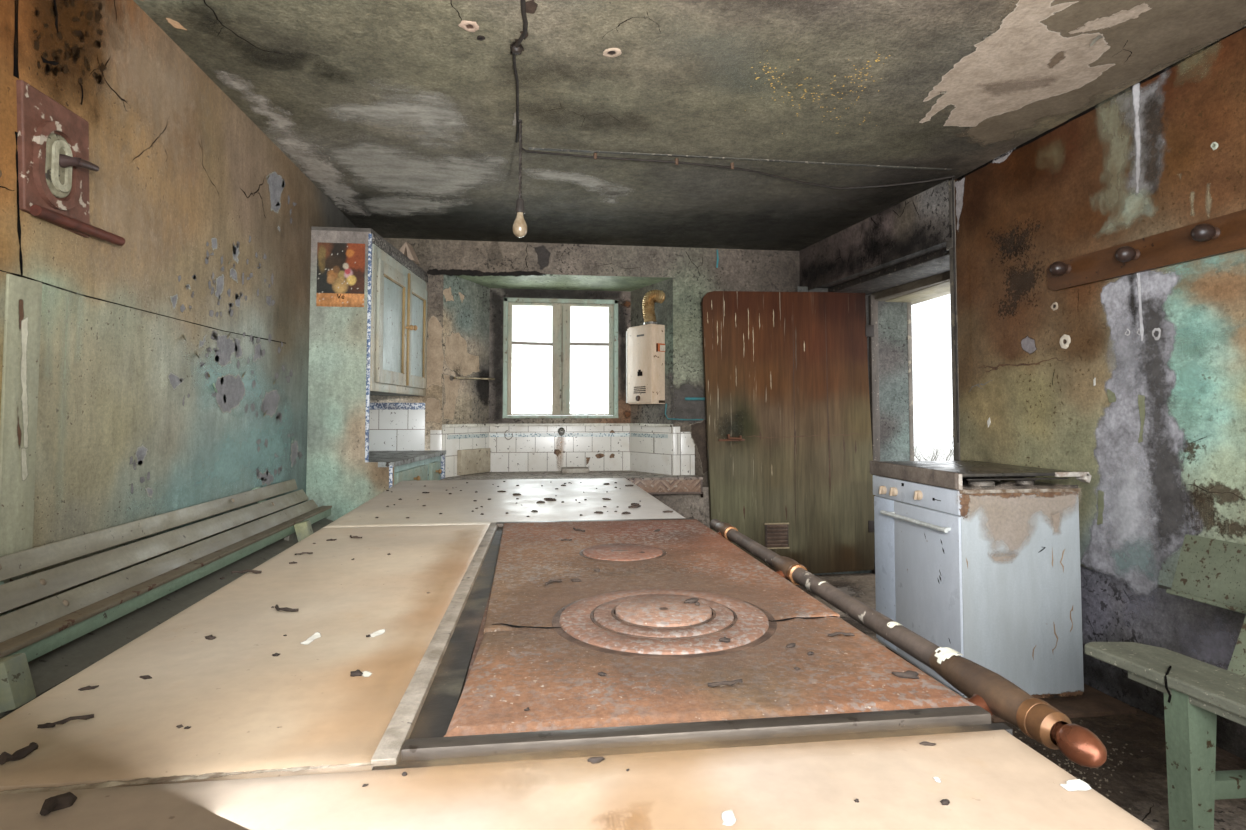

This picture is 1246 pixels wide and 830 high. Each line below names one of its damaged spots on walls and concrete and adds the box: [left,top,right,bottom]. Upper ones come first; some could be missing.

damp [33,0,106,105]
flaking render [919,0,1246,163]
crack [133,121,168,161]
crack [199,133,266,218]
damp [220,72,503,216]
spalling [427,245,553,301]
damp [802,203,945,288]
flaking render [955,178,965,230]
damp [1099,71,1167,232]
peeling [168,236,303,486]
flaking render [425,316,480,424]
damp [1081,270,1246,616]